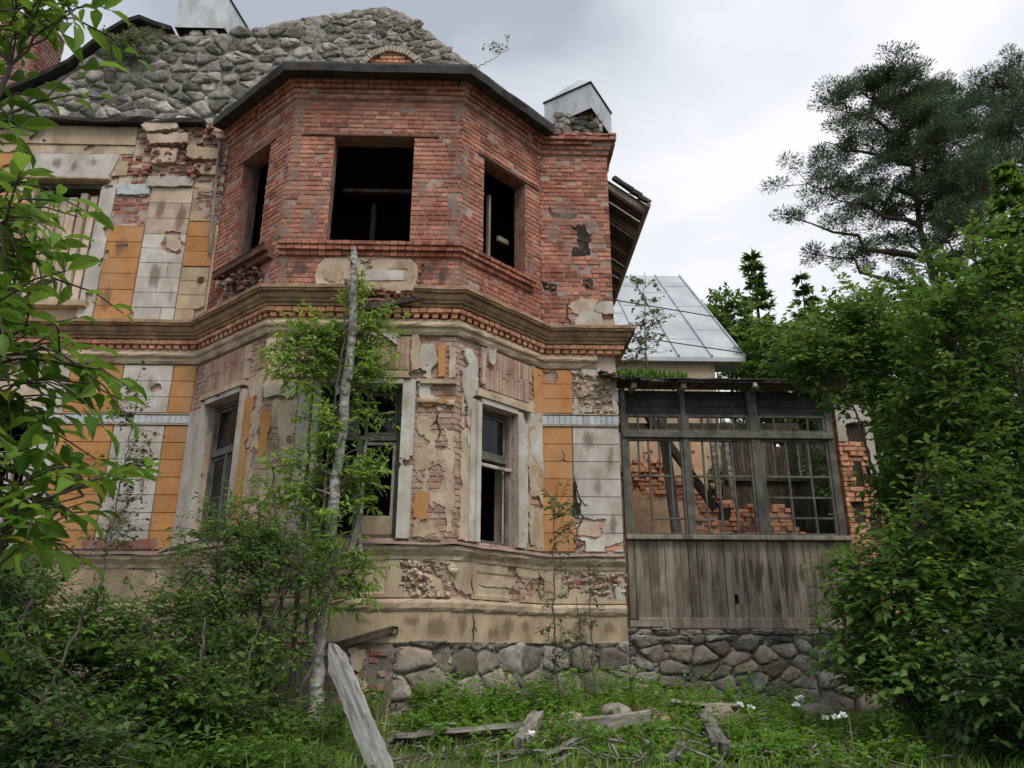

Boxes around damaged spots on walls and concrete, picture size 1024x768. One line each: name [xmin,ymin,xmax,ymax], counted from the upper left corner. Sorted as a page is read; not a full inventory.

spalling [108,119,229,229]
spalling [161,231,187,254]
spalling [549,206,592,257]
peeling [315,256,426,293]
peeling [568,279,615,325]
spalling [567,366,619,415]
peeling [362,332,497,541]
crack [560,452,588,531]
spalling [570,516,624,558]
spalling [399,560,459,598]
crack [471,570,542,638]